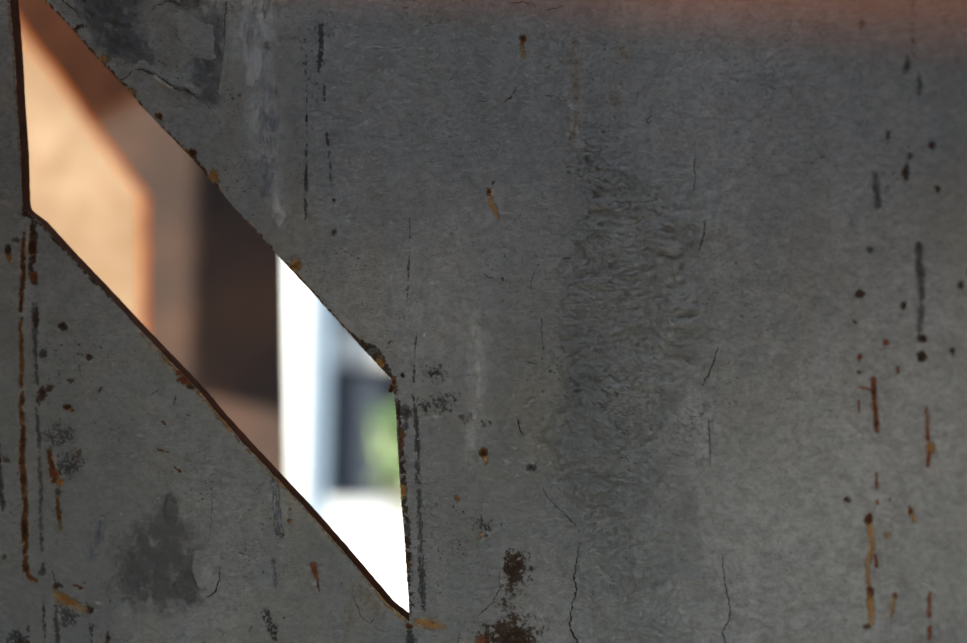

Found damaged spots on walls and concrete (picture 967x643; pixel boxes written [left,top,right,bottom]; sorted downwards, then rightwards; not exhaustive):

leakage [77,0,154,64]
corrosion [5,207,113,583]
corrosion [241,214,443,629]
corrosion [857,353,879,433]
corrosion [916,350,928,363]
corrosion [925,407,934,467]
corrosion [472,548,549,643]
crack [568,545,596,643]
corrosion [863,472,891,629]